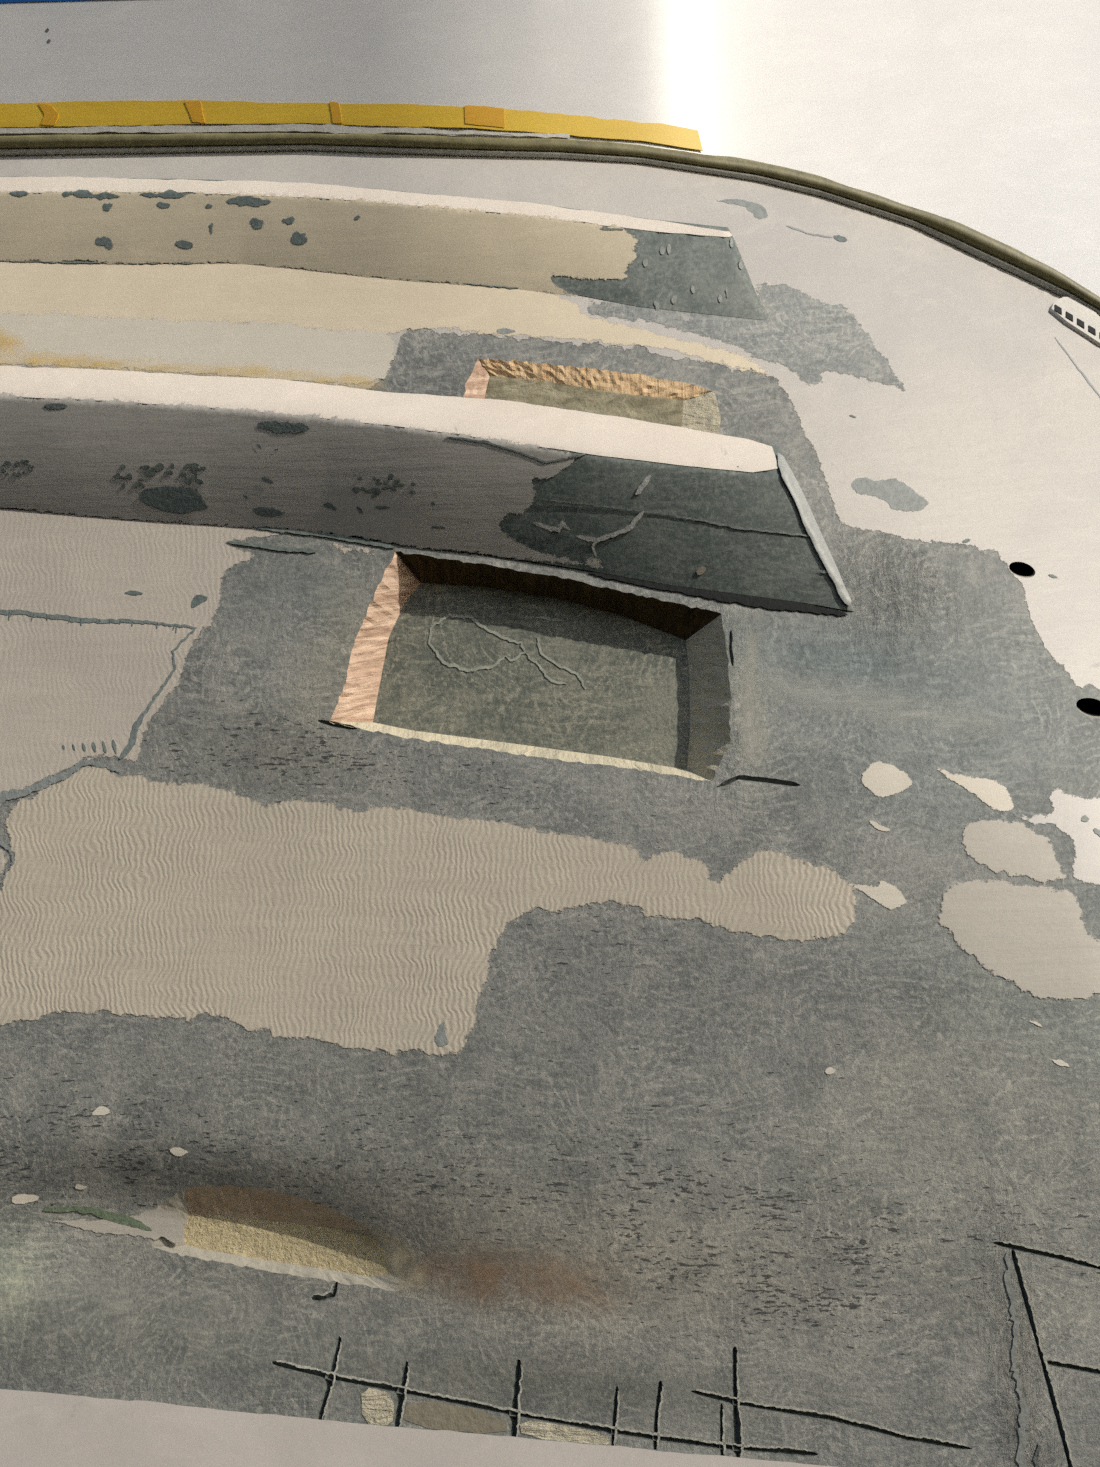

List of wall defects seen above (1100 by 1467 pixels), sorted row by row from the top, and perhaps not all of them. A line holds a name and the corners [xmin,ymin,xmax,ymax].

peeling [62,189,120,211]
peeling [140,190,184,208]
peeling [206,196,271,234]
peeling [282,216,307,245]
peeling [96,237,113,249]
peeling [175,240,193,249]
peeling [256,421,309,450]
peeling [114,463,209,514]
peeling [353,474,416,513]
peeling [243,495,285,517]
peeling [191,595,207,607]
peeling [435,1022,449,1046]